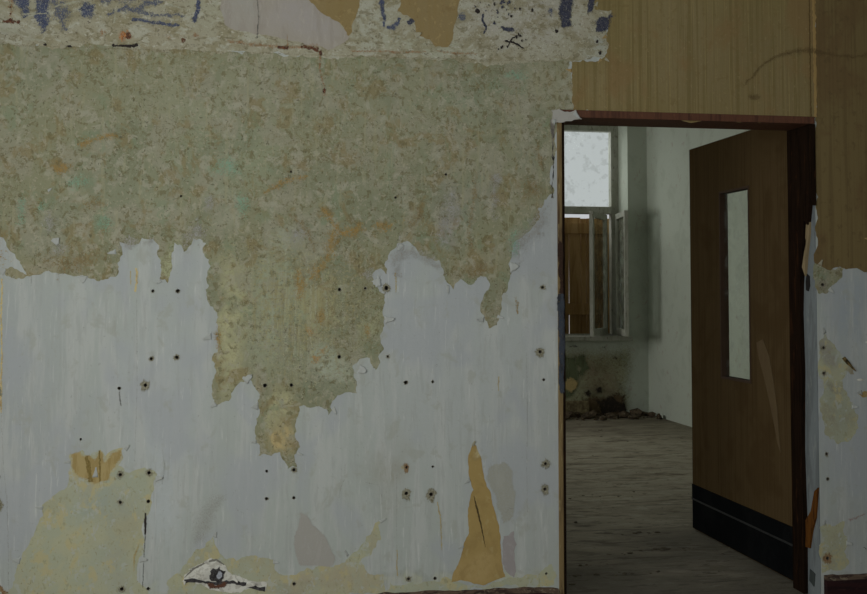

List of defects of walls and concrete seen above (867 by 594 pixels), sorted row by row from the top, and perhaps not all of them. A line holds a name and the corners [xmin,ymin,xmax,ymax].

peeling [0,0,611,473]
peeling [813,260,844,294]
peeling [818,327,867,444]
peeling [0,440,163,594]
peeling [166,441,557,594]
peeling [809,520,853,586]